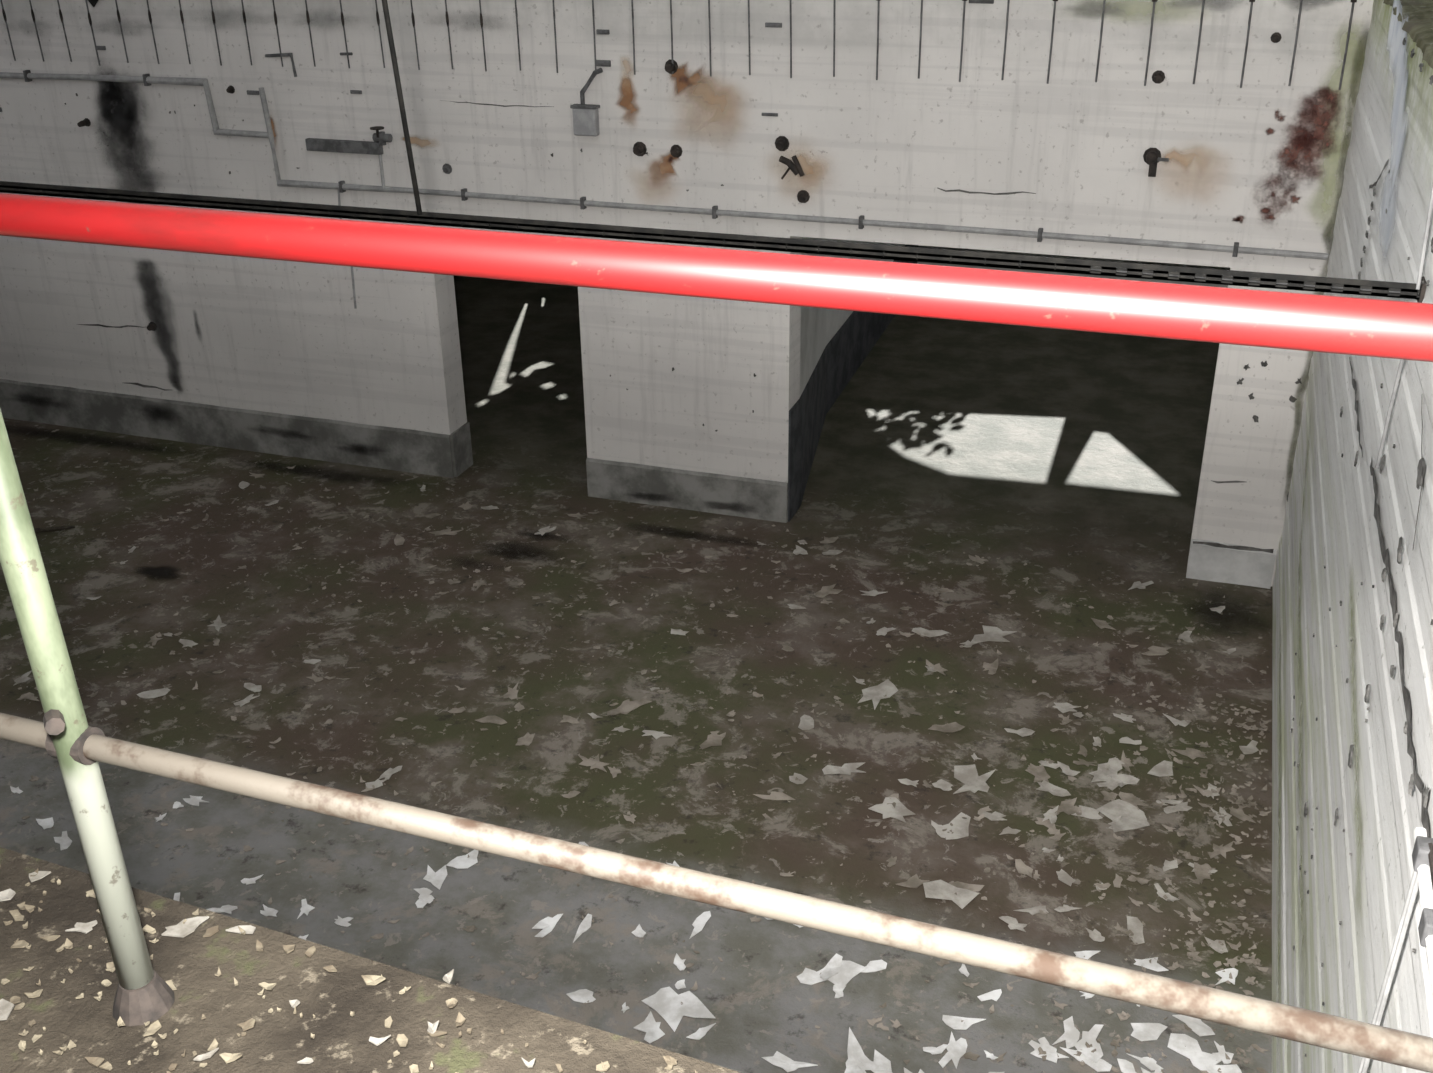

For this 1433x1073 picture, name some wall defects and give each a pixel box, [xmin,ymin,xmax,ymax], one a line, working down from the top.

rust [618,61,638,117]
rust [671,66,723,102]
water stain [109,118,154,204]
rust [653,153,679,177]
rust [1261,88,1339,219]
water stain [139,262,182,390]